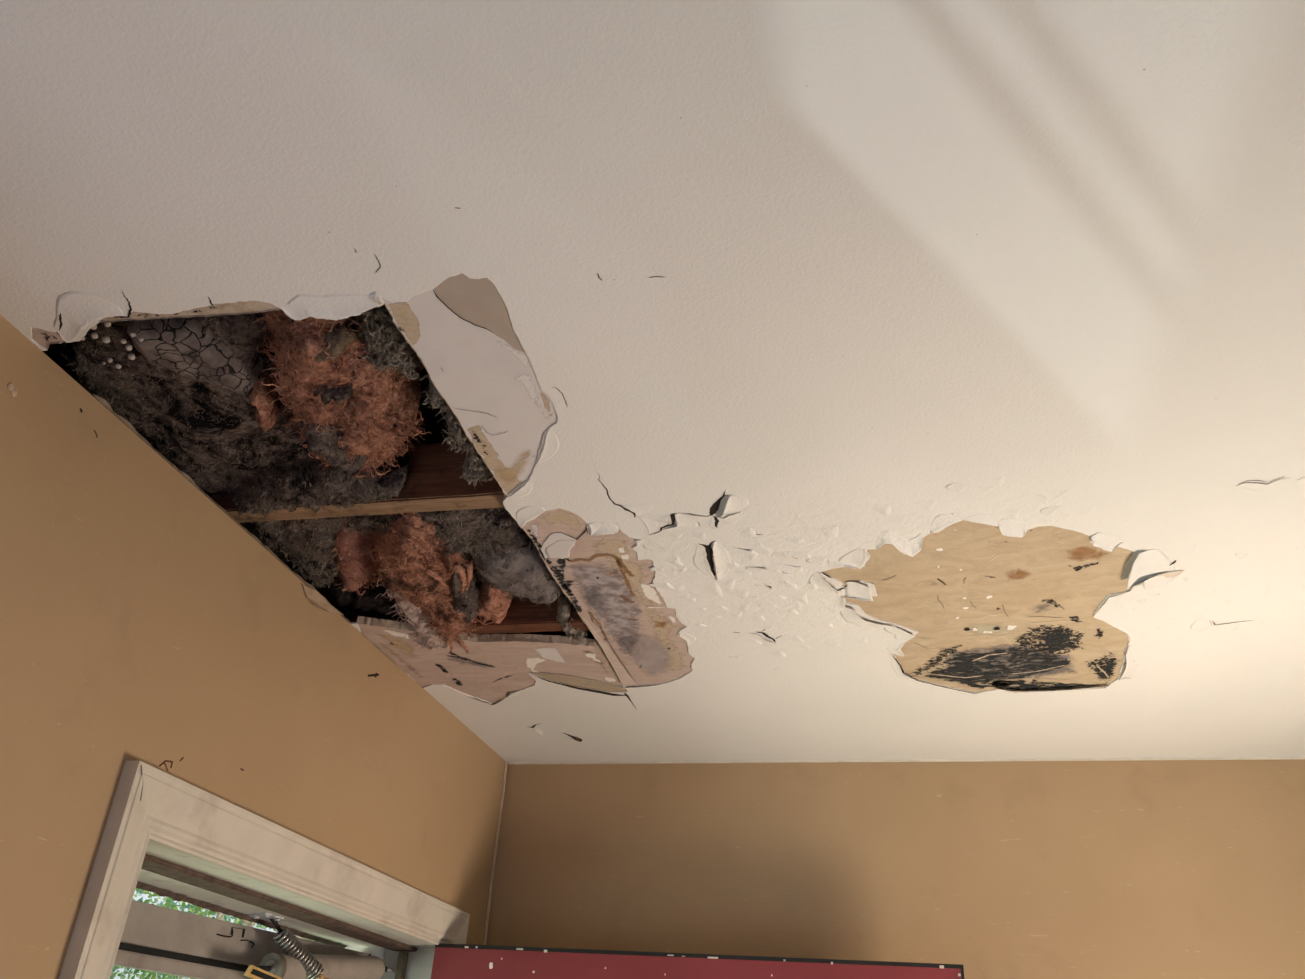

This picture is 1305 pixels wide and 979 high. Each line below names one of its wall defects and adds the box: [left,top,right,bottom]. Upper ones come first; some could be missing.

peeling [32,328,64,349]
peeling [358,273,696,708]
crack [598,474,762,581]
peeling [302,584,344,615]
peeling [808,514,1184,694]